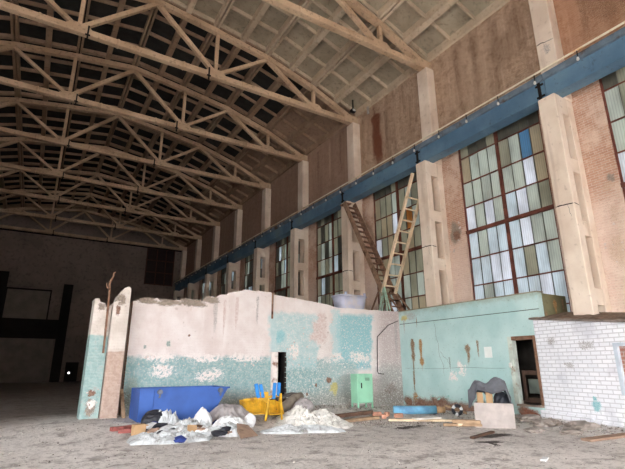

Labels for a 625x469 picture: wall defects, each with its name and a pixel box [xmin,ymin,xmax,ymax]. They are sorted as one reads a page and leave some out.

water stain [371,91,410,167]
peeling [124,351,263,407]
corrosion [410,339,424,401]